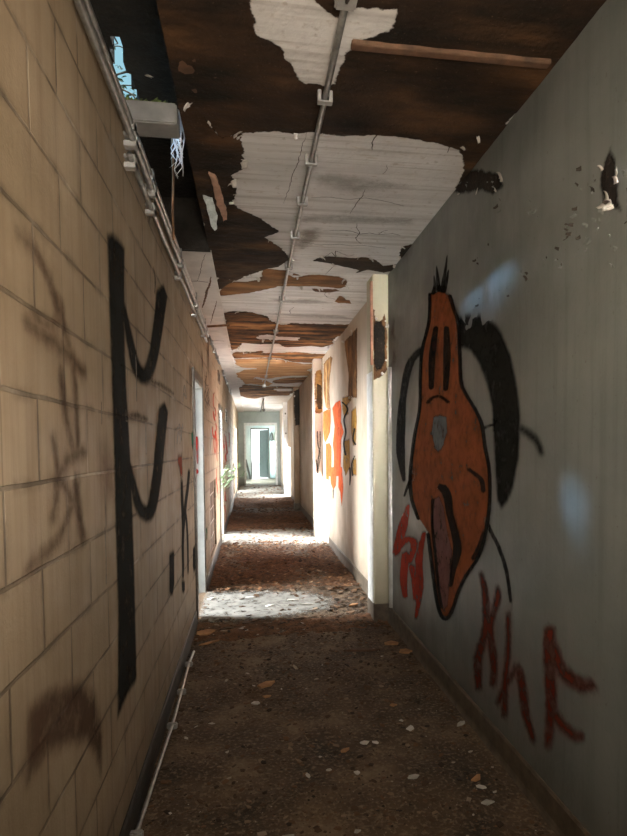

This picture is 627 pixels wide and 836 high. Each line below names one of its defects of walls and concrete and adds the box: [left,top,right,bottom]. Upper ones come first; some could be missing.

peeling [156,0,606,304]
spalling [596,151,621,211]
peeling [224,311,357,426]
spalling [373,309,389,380]